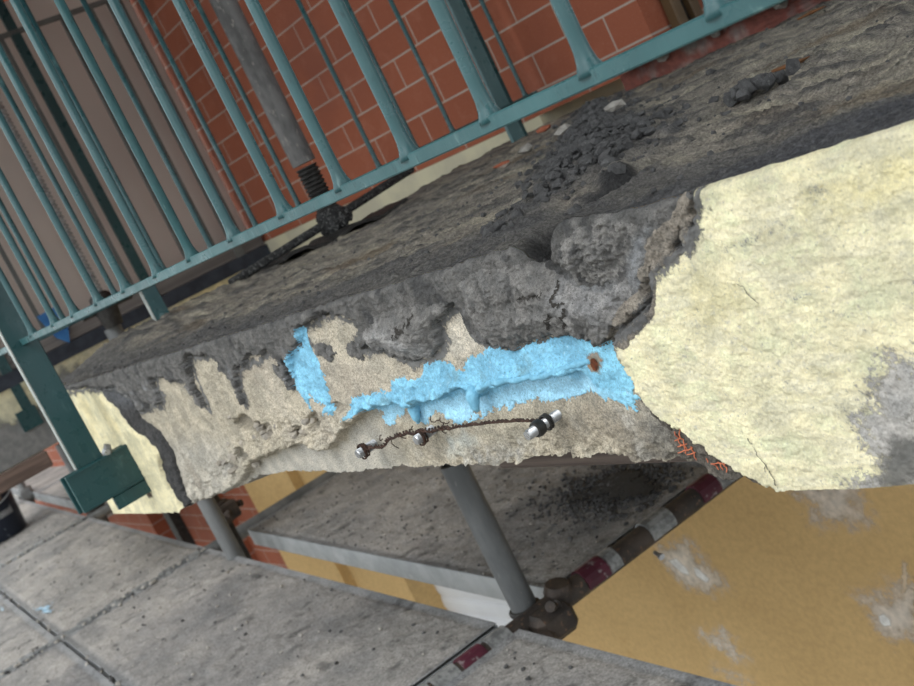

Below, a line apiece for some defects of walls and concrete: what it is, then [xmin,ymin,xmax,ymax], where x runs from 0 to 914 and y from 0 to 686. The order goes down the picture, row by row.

spalling [605,191,697,350]
spalling [102,306,761,508]
corrosion [587,352,602,373]